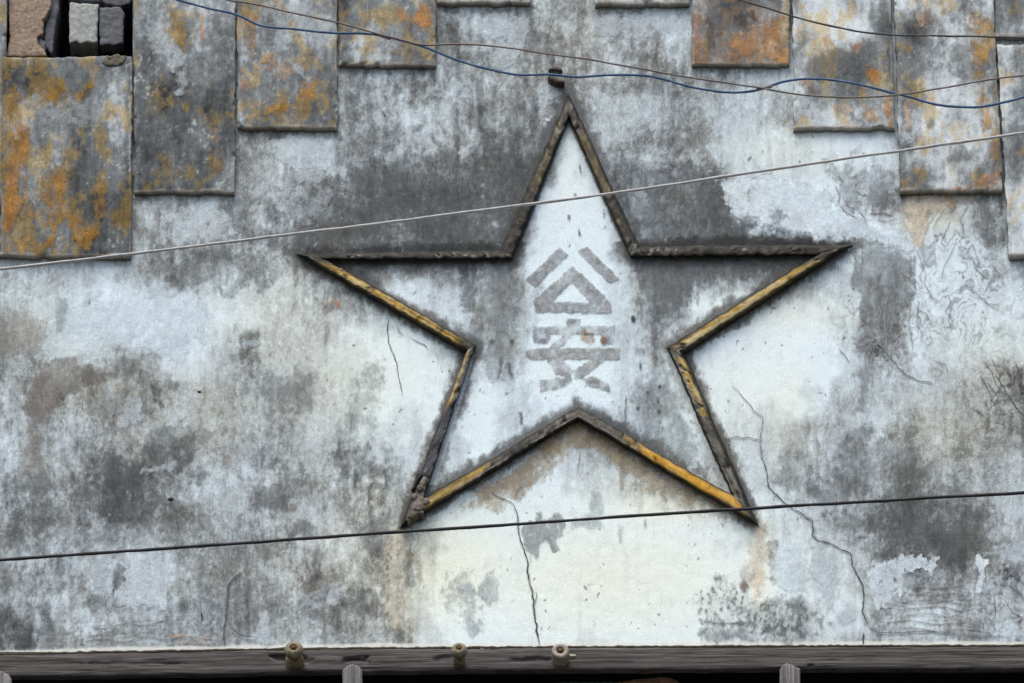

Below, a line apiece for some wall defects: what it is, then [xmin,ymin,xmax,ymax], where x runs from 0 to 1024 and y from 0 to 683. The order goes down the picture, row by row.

corrosion [693,10,788,63]
corrosion [46,74,94,106]
corrosion [1,86,107,254]
damp [0,312,116,477]
crack [387,321,402,391]
crack [874,338,934,384]
damp [332,448,387,487]
crack [732,385,1006,643]
damp [340,534,404,627]
crack [491,486,540,642]
damp [698,524,831,643]
peeling [885,570,1024,633]